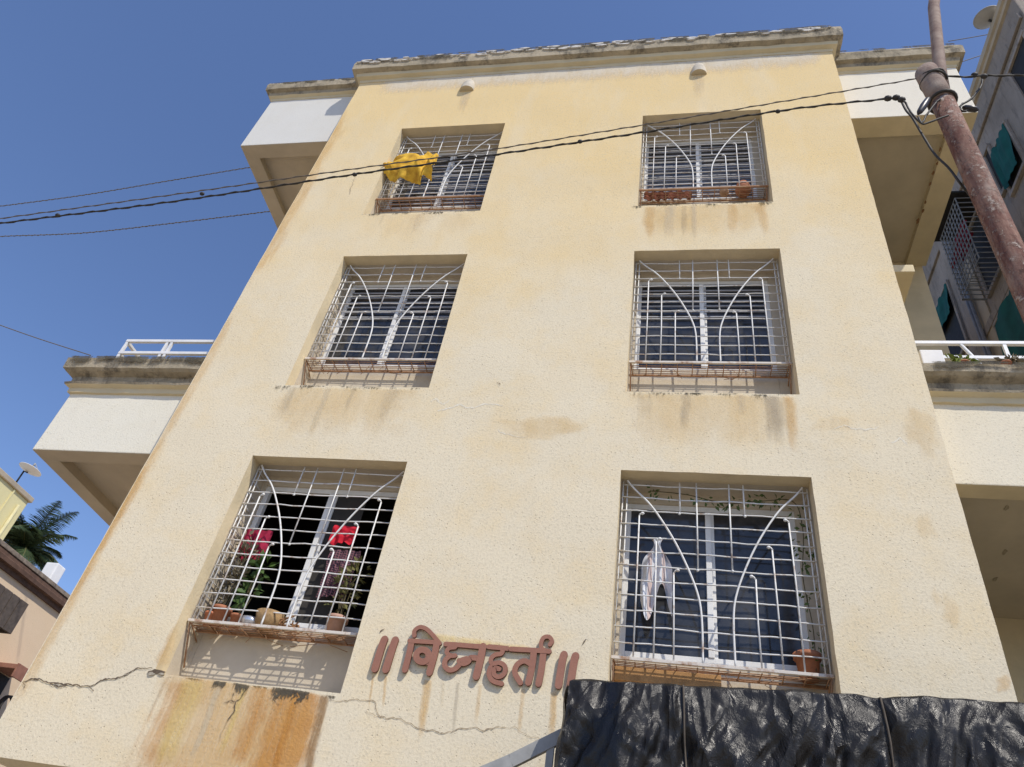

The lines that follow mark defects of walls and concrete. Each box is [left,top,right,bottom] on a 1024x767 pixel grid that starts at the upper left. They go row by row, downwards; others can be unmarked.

crack [23,667,152,691]
crack [220,687,246,739]
rust [217,693,327,767]
crack [339,698,538,738]